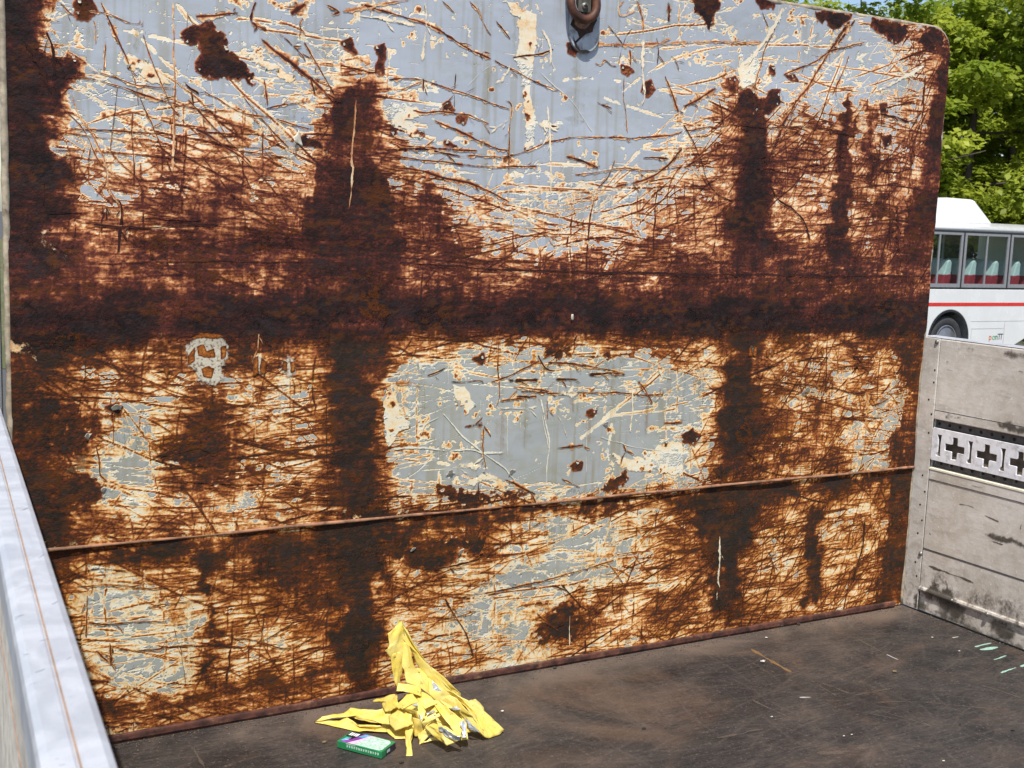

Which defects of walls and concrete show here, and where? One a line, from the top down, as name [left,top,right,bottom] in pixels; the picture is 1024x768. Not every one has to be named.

peeling [72,0,98,22]
peeling [690,0,721,31]
peeling [815,10,853,34]
peeling [179,13,279,105]
peeling [340,37,358,56]
peeling [374,43,387,77]
peeling [870,17,950,75]
peeling [725,62,799,125]
rust [5,0,949,335]
peeling [681,427,702,447]
peeling [430,469,529,509]
rust [10,302,928,734]